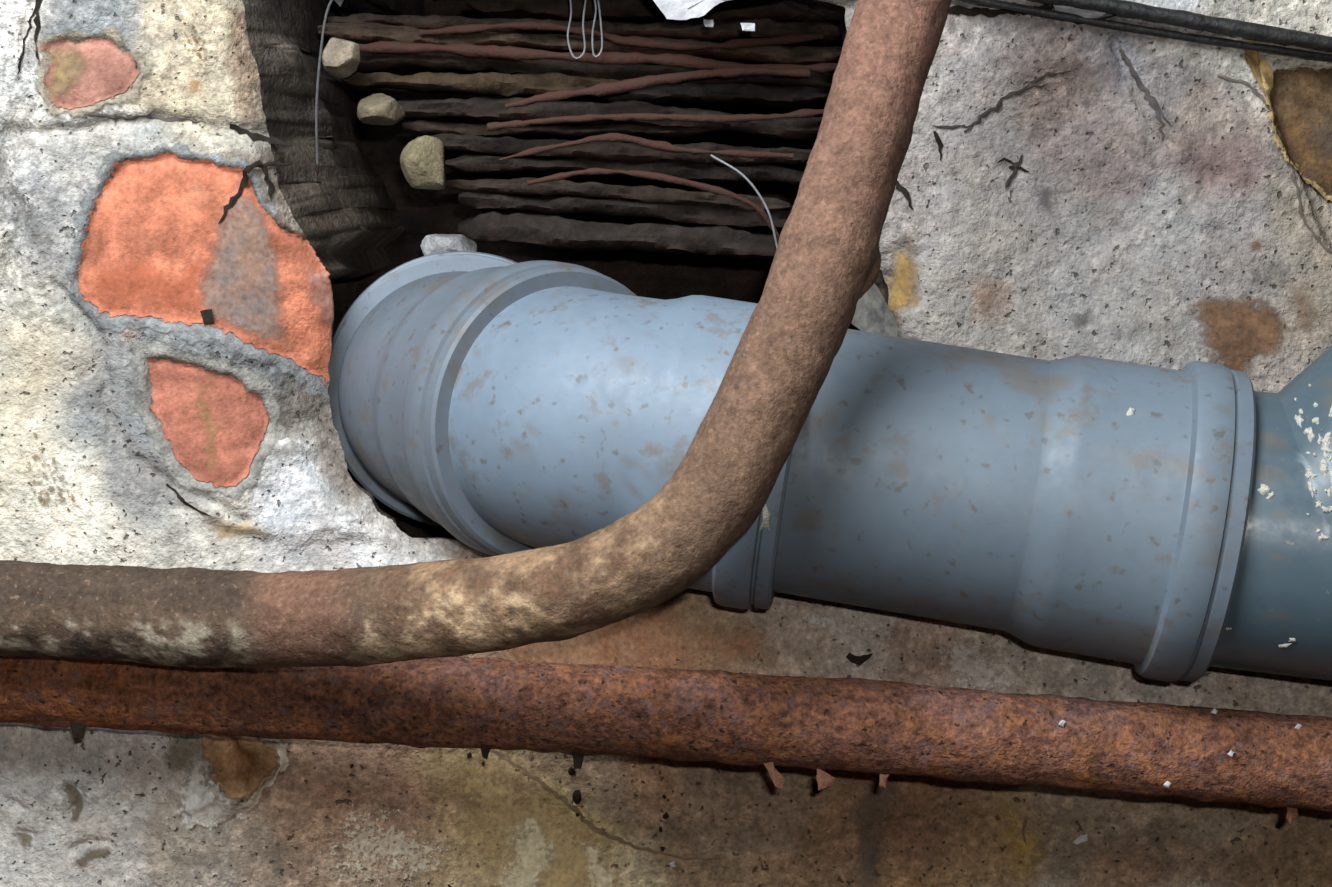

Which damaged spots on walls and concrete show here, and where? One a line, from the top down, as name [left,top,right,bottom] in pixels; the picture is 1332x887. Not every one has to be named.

crack [17,0,42,75]
flaking render [34,27,150,117]
flaking render [653,0,729,27]
flaking render [740,23,755,31]
crack [932,70,1071,161]
flaking render [1243,41,1332,202]
crack [86,113,293,224]
crack [896,180,913,210]
crack [997,155,1029,188]
flaking render [65,143,334,499]
rust [1197,298,1283,372]
flaking render [186,734,289,829]